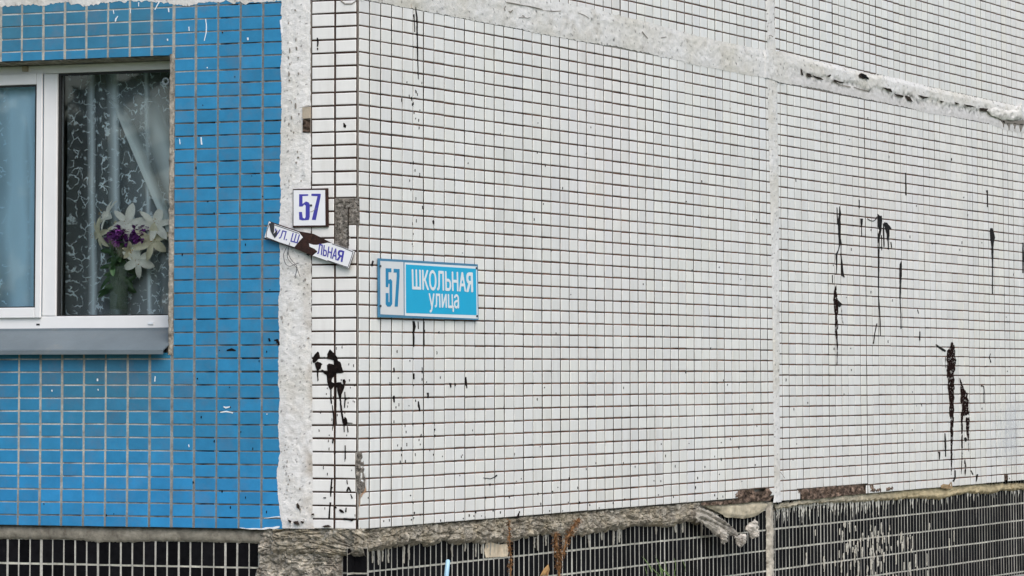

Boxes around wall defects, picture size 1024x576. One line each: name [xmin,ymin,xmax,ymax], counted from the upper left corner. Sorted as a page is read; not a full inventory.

peeling [335,198,360,249]
leakage [832,206,845,365]
leakage [867,216,892,344]
leakage [945,342,970,475]
spalling [797,483,894,500]